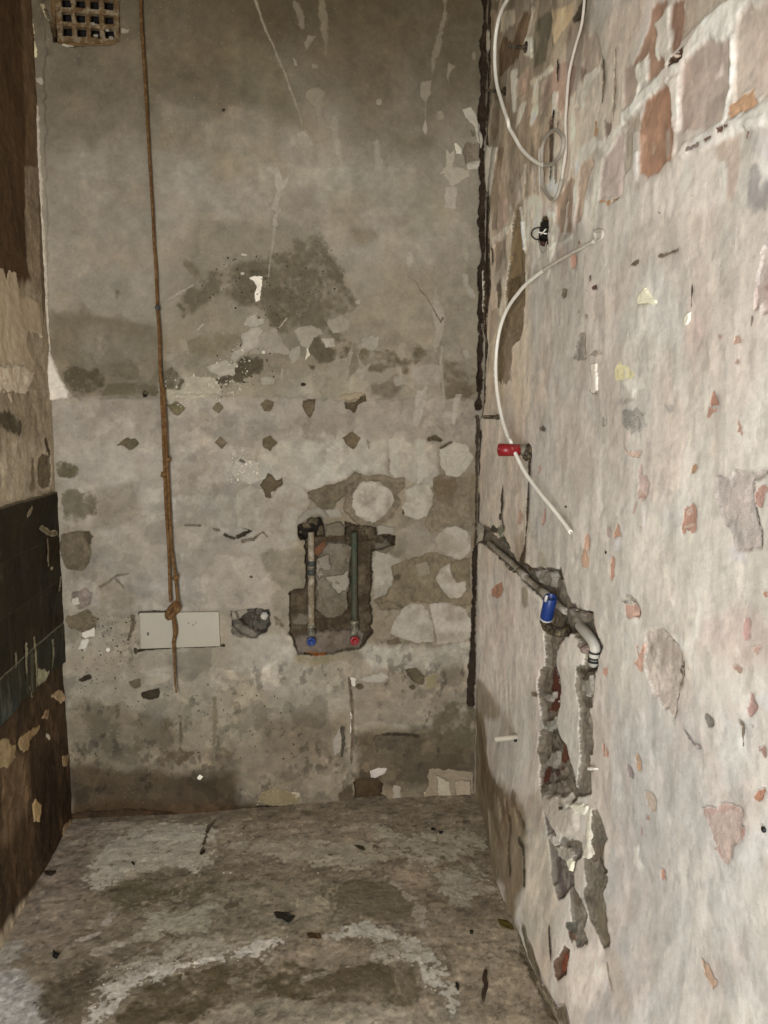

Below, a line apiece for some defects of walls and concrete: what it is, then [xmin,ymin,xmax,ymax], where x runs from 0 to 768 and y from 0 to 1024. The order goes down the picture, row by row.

peeling [0,105,78,404]
spalling [240,272,263,302]
damp [49,229,478,408]
spalling [307,438,475,535]
peeling [714,467,768,553]
spalling [230,608,285,639]
spalling [373,552,472,611]
peeling [633,627,689,718]
damp [149,683,291,771]
damp [428,700,476,751]
damp [257,782,304,807]
spalling [543,808,611,983]